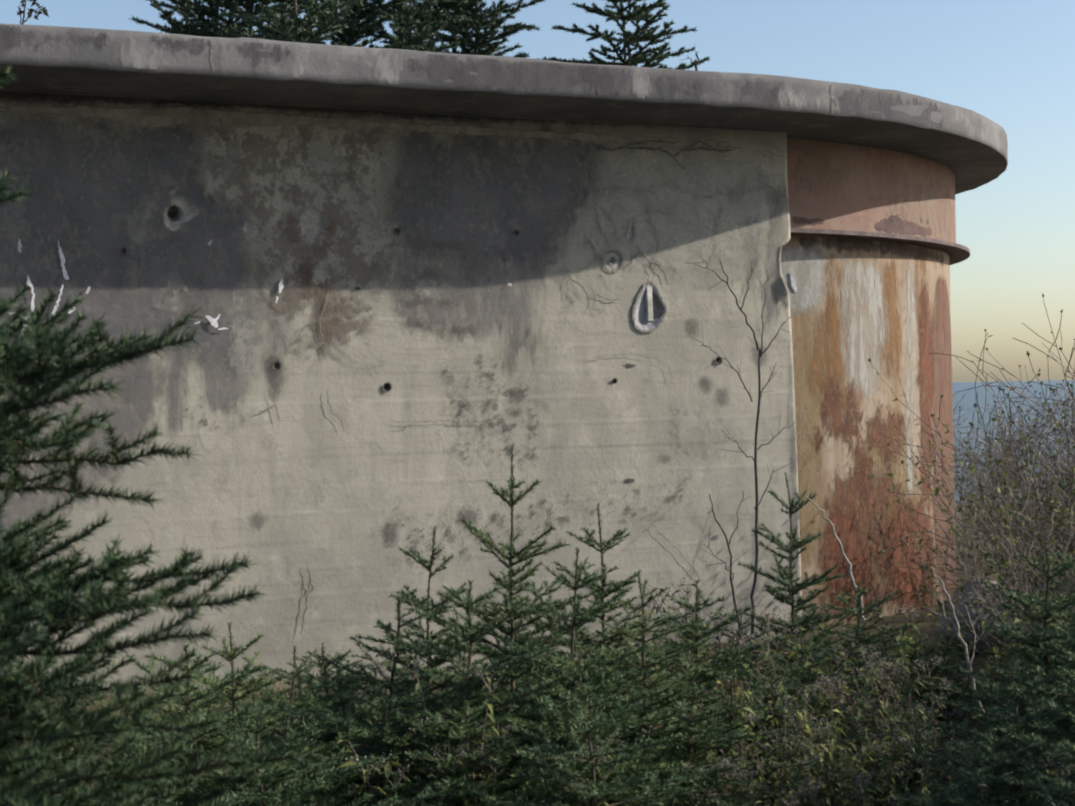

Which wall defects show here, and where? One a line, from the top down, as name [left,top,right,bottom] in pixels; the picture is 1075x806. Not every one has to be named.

spalling [163,192,199,232]
water stain [0,91,621,541]
corrosion [794,237,956,621]